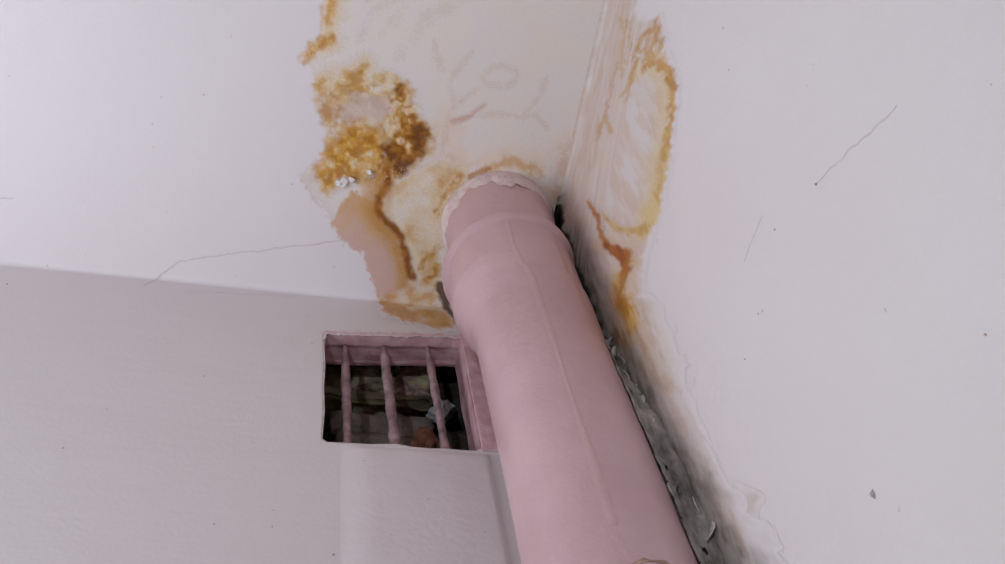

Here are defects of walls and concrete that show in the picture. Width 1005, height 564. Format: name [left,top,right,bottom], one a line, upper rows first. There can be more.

leakage [294,0,787,564]